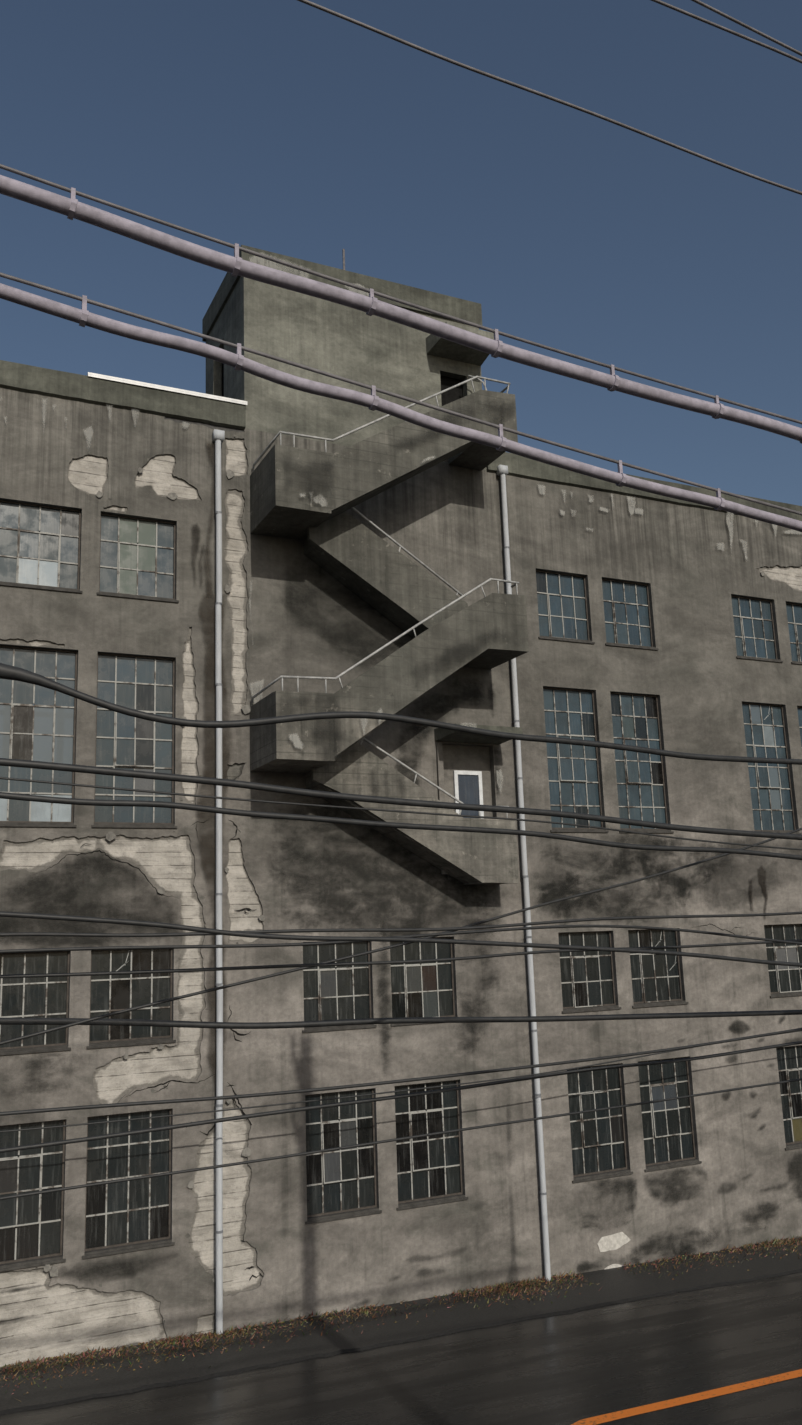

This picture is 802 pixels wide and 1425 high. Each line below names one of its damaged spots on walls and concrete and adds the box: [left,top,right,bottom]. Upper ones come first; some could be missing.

flaking render [67,455,127,514]
flaking render [134,452,201,503]
flaking render [223,435,251,716]
flaking render [758,560,802,592]
leakage [0,857,175,947]
flaking render [223,838,265,944]
leakage [541,838,715,917]
flaking render [0,831,208,1104]
crack [228,1006,249,1042]
crack [126,1075,252,1136]
flaking render [185,1099,264,1296]
flaking render [0,1264,167,1367]